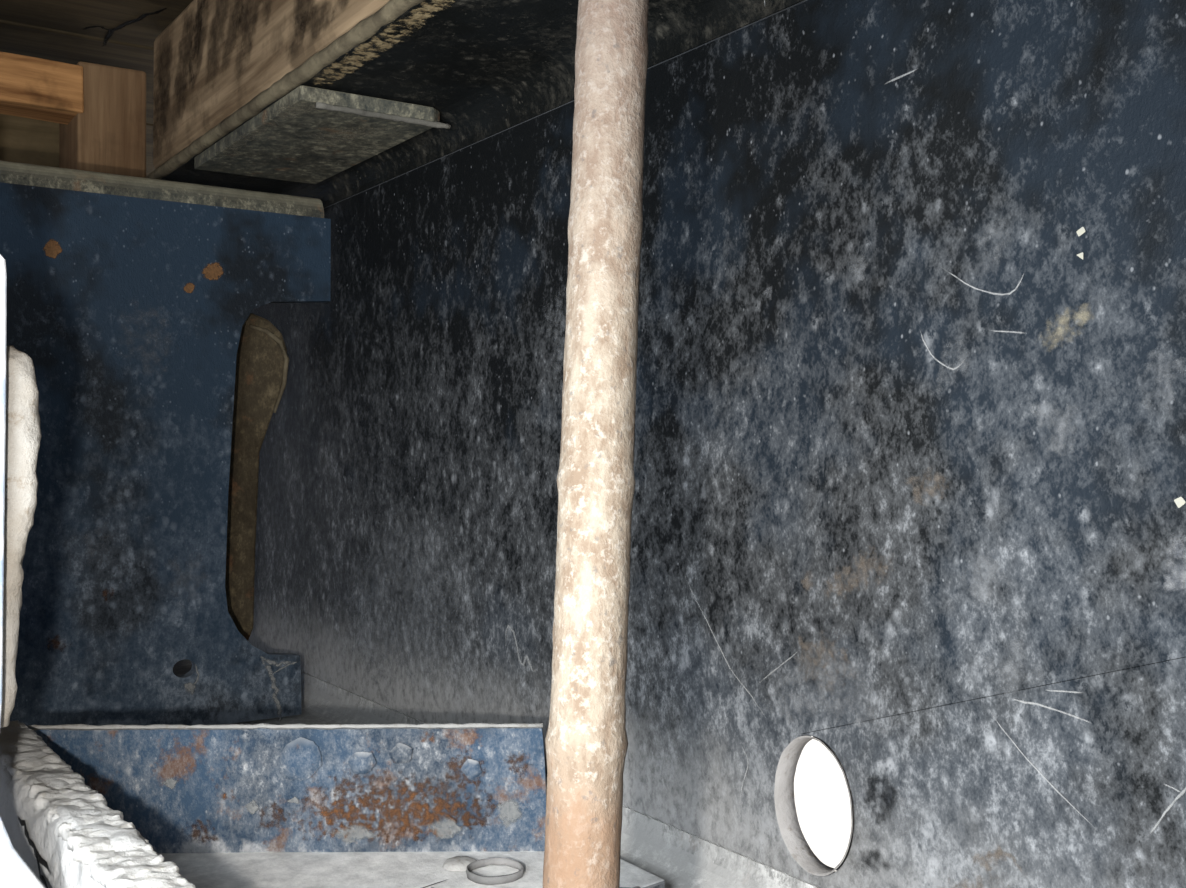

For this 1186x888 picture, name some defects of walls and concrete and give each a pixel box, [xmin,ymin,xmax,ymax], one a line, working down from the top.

leakage [291,0,328,48]
leakage [153,0,269,142]
rust [43,239,62,259]
rust [184,262,223,293]
leakage [1055,311,1088,336]
rust [507,754,528,779]
rust [302,750,496,842]
leakage [866,778,895,820]
rust [260,802,286,828]